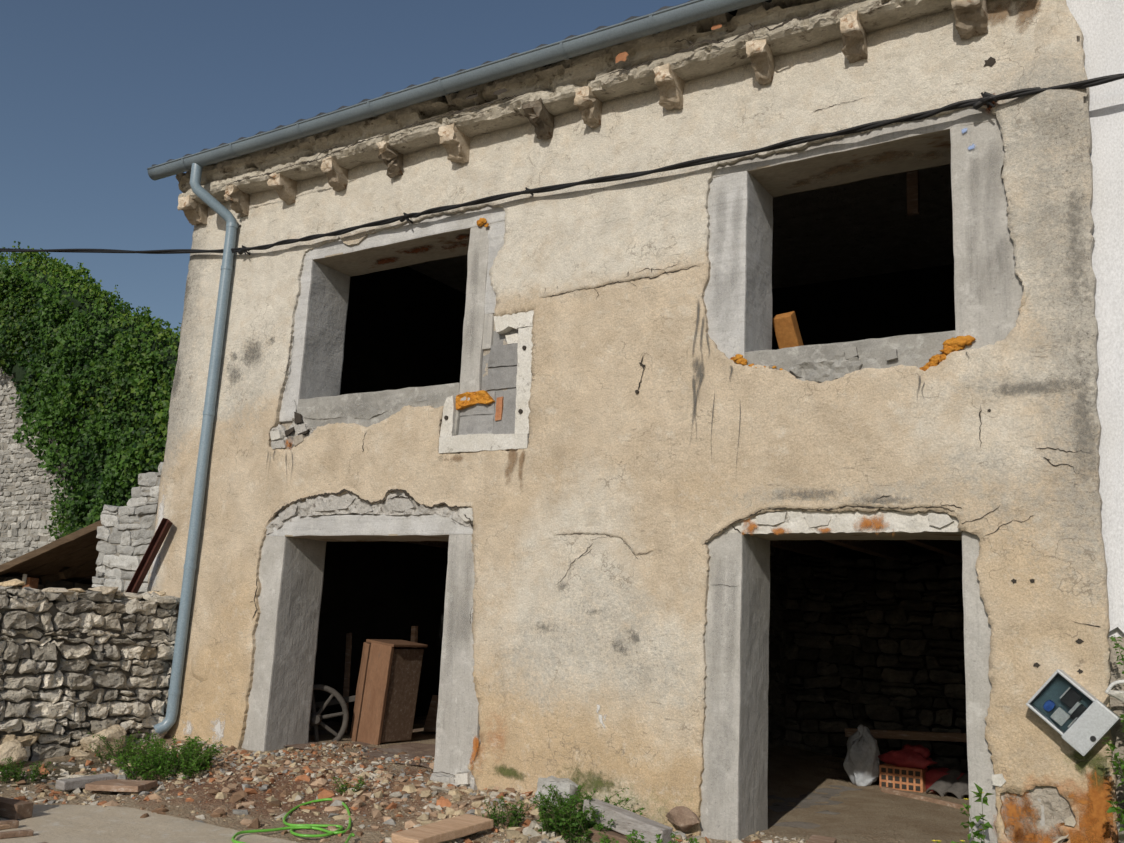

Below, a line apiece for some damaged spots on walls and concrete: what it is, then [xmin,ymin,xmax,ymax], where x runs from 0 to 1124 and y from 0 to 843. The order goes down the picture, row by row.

crack [536,253,705,298]
water stain [692,303,710,416]
spalling [788,346,863,382]
spalling [266,491,473,534]
peeling [741,510,960,534]
crack [697,495,1034,545]
rust [860,516,885,530]
crack [553,526,655,583]
spalling [991,774,1076,843]
rust [995,772,1114,843]